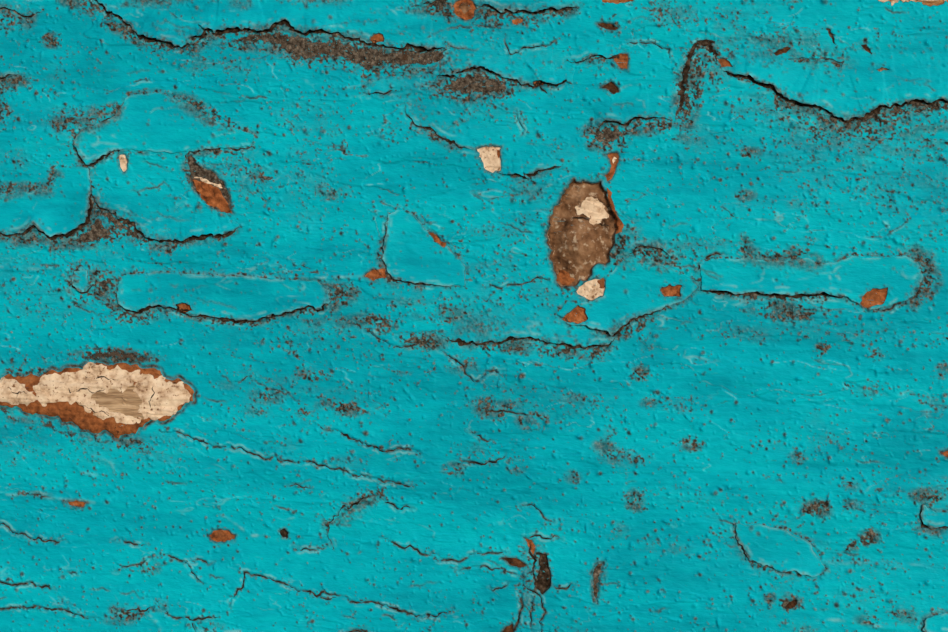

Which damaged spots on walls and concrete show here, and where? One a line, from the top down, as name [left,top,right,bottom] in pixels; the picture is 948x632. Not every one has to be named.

peeling [83,0,948,181]
peeling [0,92,255,246]
peeling [575,197,609,225]
peeling [72,269,92,294]
peeling [442,231,930,349]
peeling [0,362,194,439]
crack [234,572,451,617]
peeling [504,538,551,594]